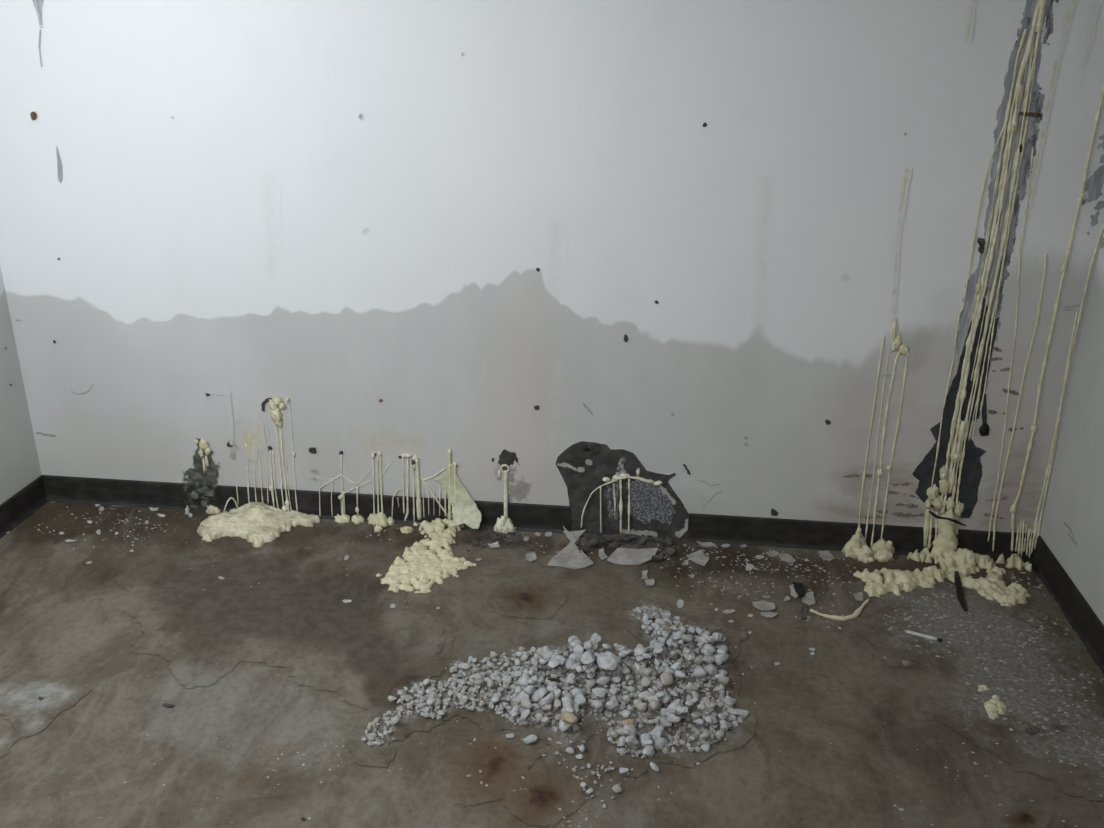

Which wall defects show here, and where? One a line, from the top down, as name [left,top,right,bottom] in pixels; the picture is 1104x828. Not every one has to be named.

peeling [31,0,45,69]
leakage [0,166,982,521]
peeling [912,0,1059,519]
leakage [971,0,1104,625]
peeling [1077,133,1104,254]
spalling [555,440,716,579]
leakage [958,518,971,530]